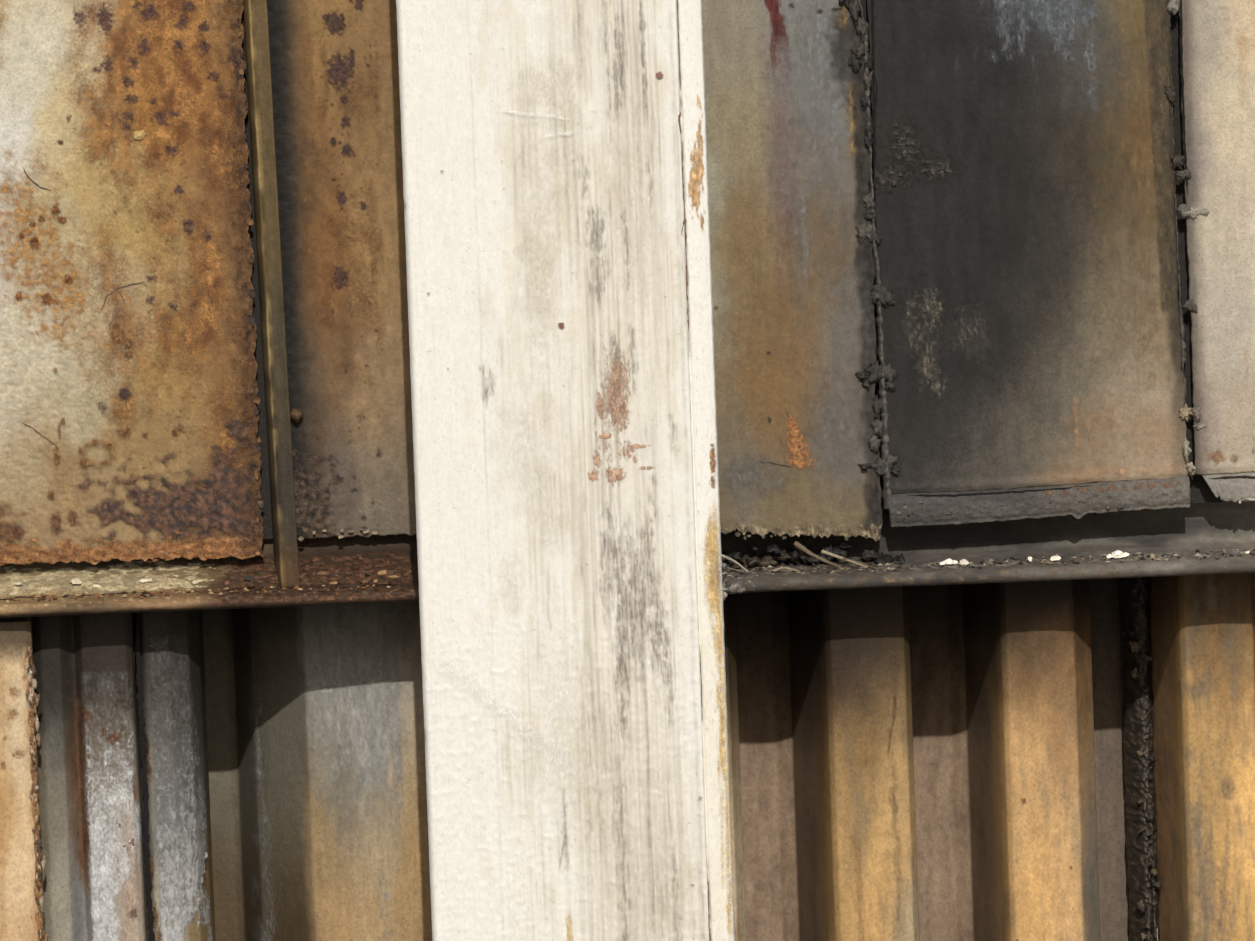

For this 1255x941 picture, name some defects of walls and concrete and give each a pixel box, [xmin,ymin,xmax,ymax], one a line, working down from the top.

rust [0,0,413,605]
rust [787,416,816,469]
peeling [85,719,214,941]